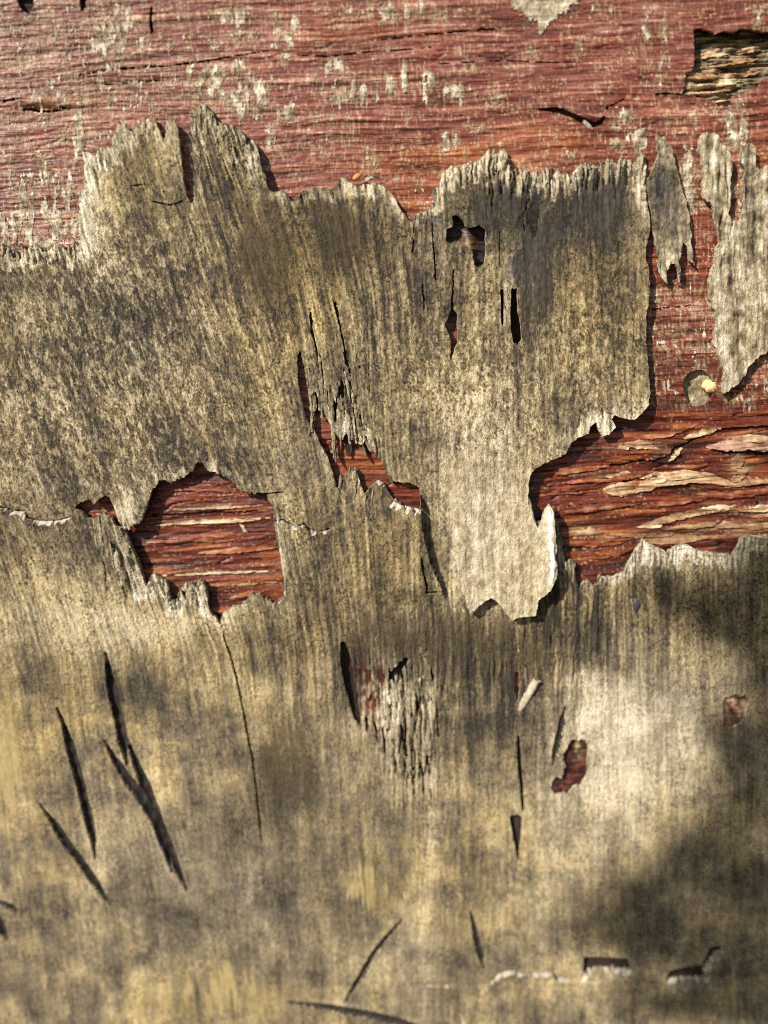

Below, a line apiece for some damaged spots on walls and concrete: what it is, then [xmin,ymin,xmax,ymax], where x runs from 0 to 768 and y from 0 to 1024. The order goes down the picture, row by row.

crack [499,197,527,267]
peeling [0,0,768,629]
crack [219,619,262,839]
crack [340,641,359,719]
crack [389,657,409,678]
peeling [551,706,587,793]
peeling [723,694,748,728]
crack [509,736,524,859]